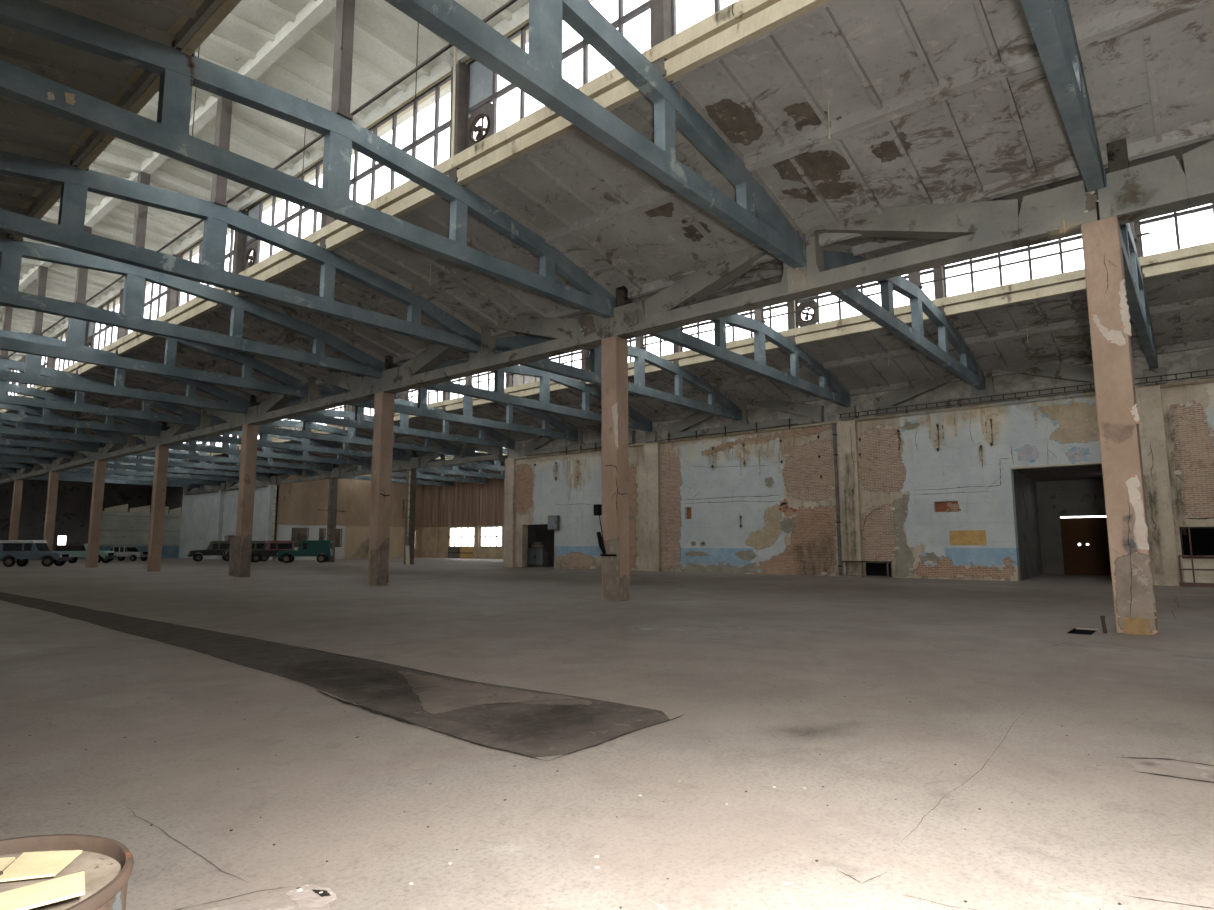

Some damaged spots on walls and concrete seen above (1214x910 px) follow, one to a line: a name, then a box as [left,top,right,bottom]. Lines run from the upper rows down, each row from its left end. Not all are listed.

peeling [705,99,763,146]
peeling [784,102,842,131]
peeling [871,132,912,162]
peeling [773,150,855,203]
peeling [1090,279,1132,346]
flaking render [1170,401,1214,520]
flaking render [660,424,837,575]